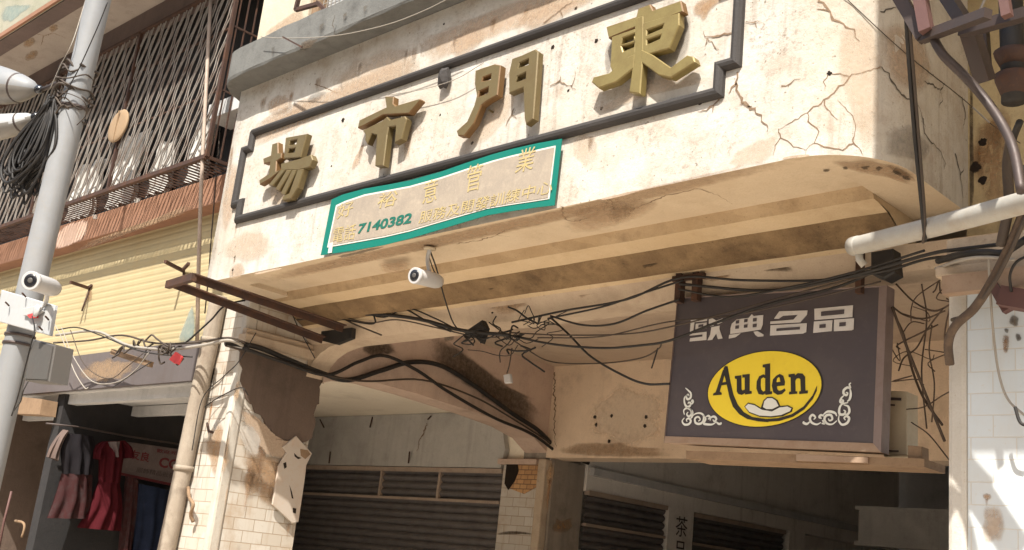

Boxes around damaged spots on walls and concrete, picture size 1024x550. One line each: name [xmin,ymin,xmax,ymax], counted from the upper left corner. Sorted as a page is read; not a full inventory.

crack [698,66,966,194]
water stain [843,162,911,182]
water stain [364,344,393,354]
water stain [440,336,530,420]
peeling [241,412,290,458]
spalling [504,464,538,494]